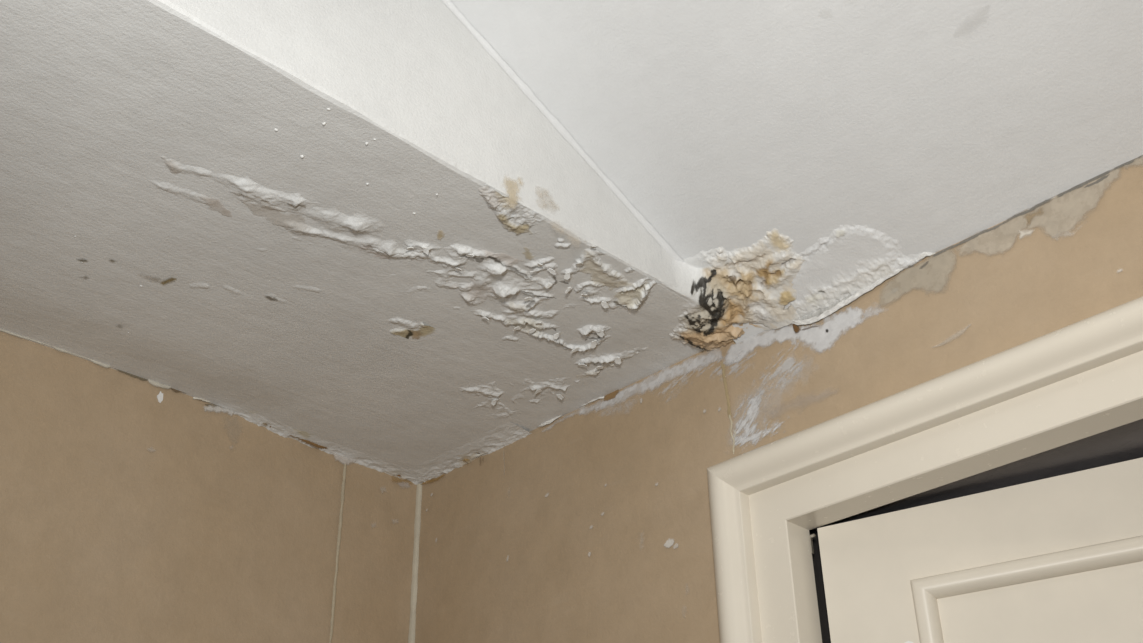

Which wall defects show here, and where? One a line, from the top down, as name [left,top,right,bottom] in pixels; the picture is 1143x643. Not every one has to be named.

peeling [149,155,411,260]
spalling [659,157,1143,351]
spalling [388,317,436,340]
mould [680,269,728,350]
peeling [582,390,618,406]